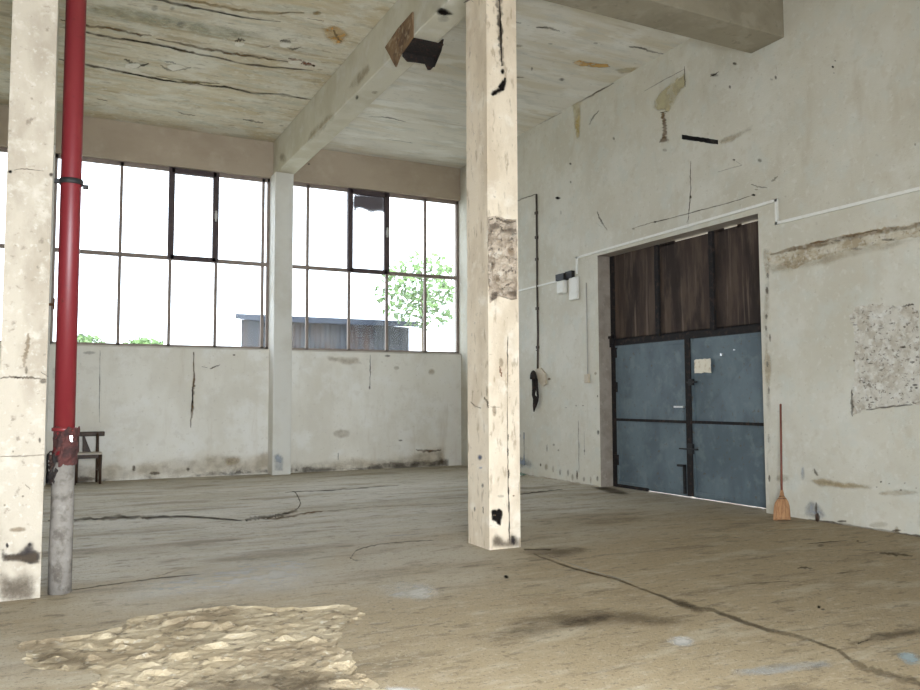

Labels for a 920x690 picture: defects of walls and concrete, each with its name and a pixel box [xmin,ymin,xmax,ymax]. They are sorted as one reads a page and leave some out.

crack [158,0,302,22]
crack [61,19,304,70]
crack [491,0,506,96]
crack [60,59,307,99]
spalling [487,216,518,303]
spalling [766,222,920,269]
spalling [849,303,920,416]
crack [188,352,196,427]
crack [74,485,396,521]